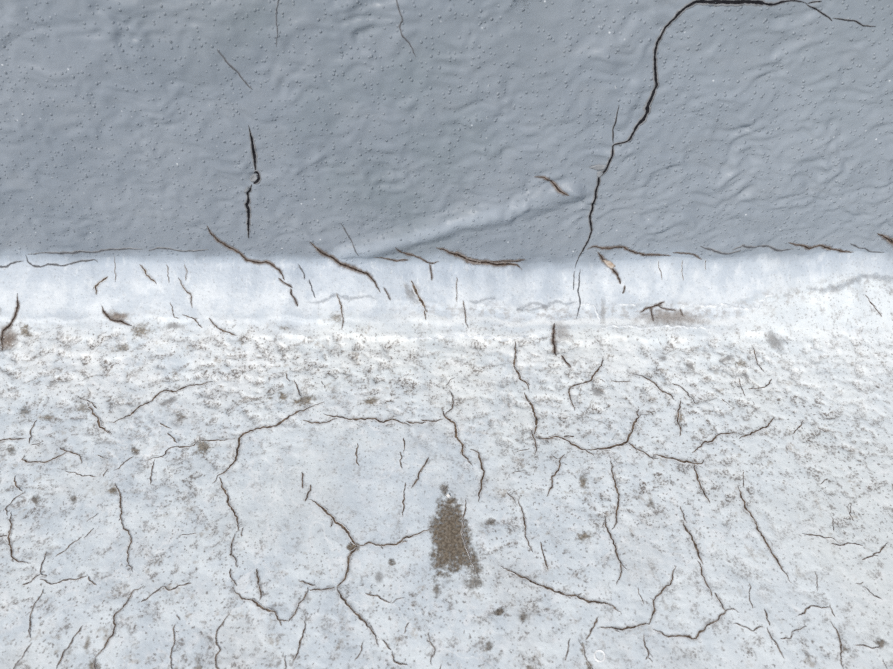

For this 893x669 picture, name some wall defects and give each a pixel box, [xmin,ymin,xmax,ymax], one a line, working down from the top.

crack [0,293,20,351]
crack [0,125,315,336]
crack [309,223,525,328]
crack [535,176,569,196]
crack [573,0,893,321]
crack [0,373,486,669]
crack [499,323,893,669]